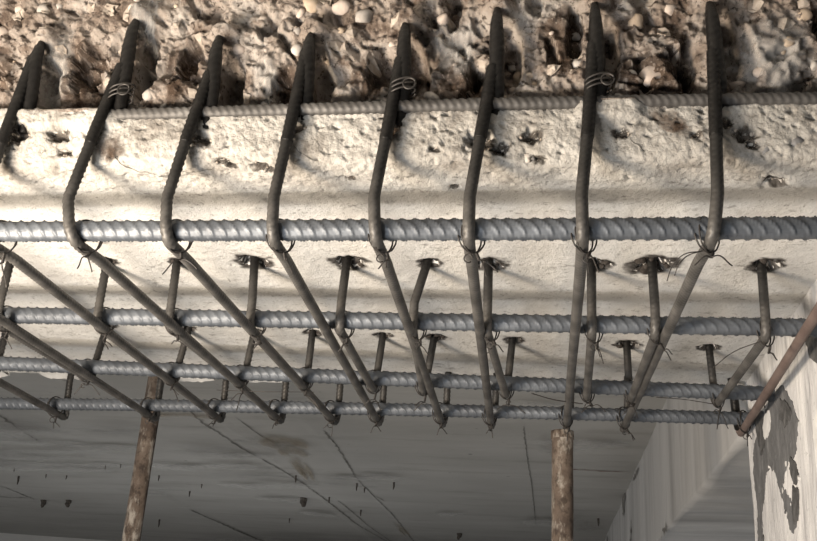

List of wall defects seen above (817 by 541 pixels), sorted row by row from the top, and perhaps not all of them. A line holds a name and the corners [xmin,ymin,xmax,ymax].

spalling [0,0,817,134]
spalling [611,129,630,139]
spalling [723,118,769,155]
crack [190,412,414,541]